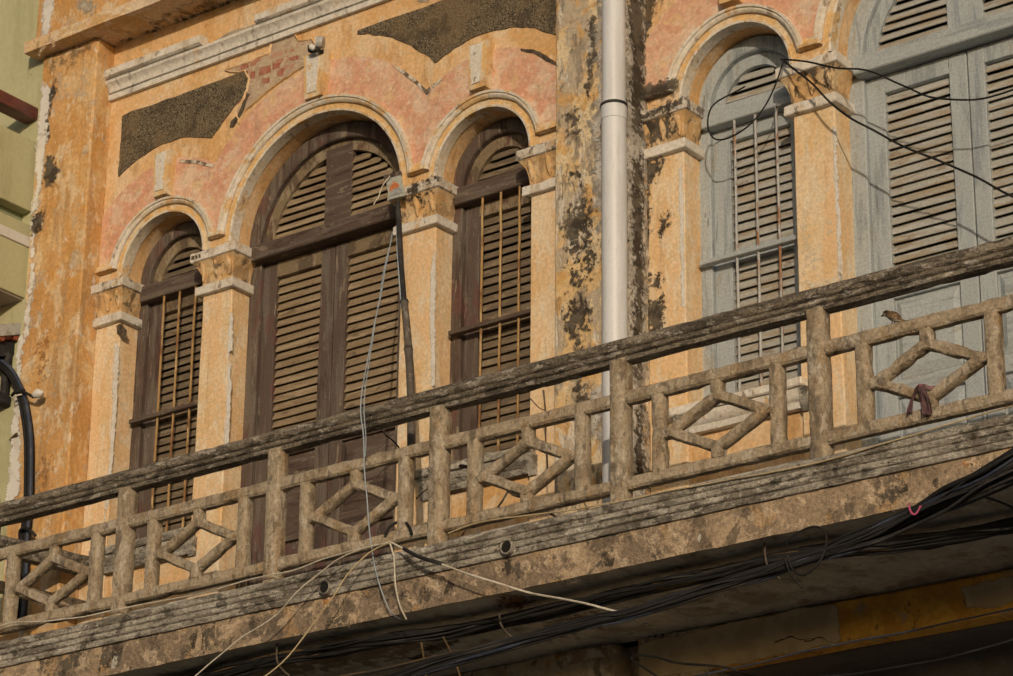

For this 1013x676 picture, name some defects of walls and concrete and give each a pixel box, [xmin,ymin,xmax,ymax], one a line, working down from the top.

spalling [225,34,315,127]
damp [556,0,602,351]
damp [566,379,602,402]
damp [591,413,602,441]